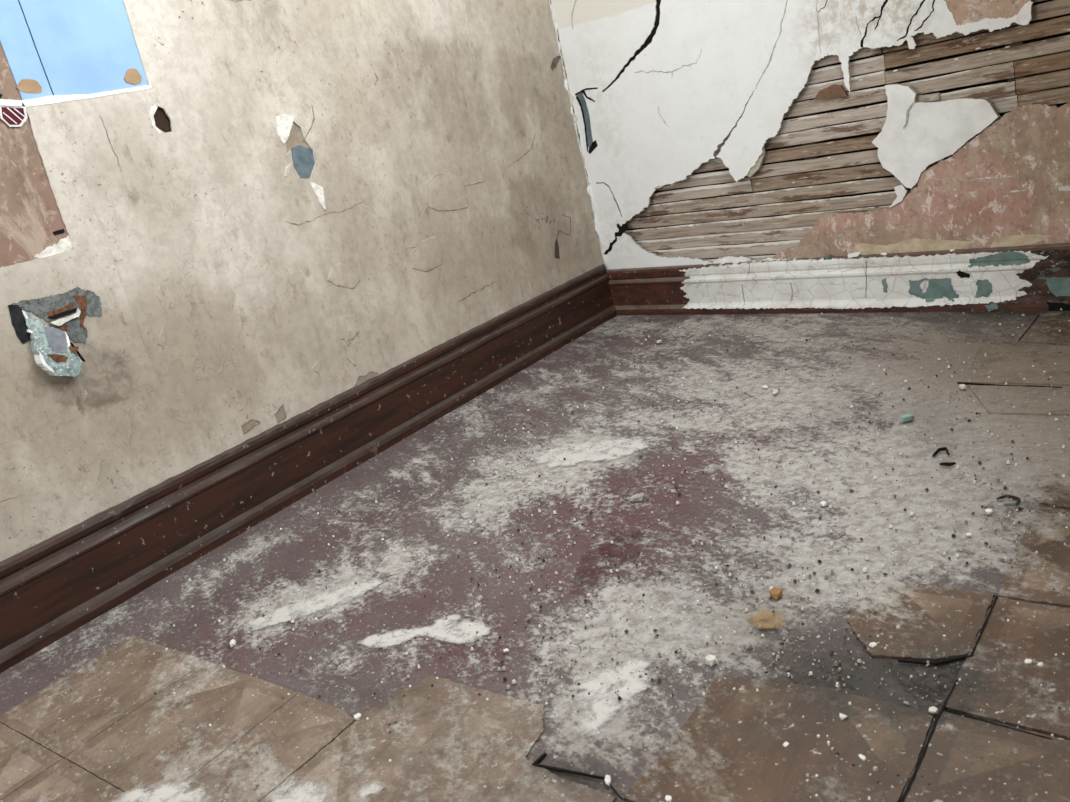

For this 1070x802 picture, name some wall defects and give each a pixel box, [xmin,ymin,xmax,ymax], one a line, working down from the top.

peeling [124,68,142,84]
crack [603,0,702,92]
crack [713,0,788,157]
crack [816,0,827,54]
crack [856,0,935,48]
peeling [0,42,73,268]
spalling [150,105,171,134]
peeling [276,105,326,211]
flaking render [625,0,1070,311]
crack [596,182,629,255]
spalling [8,305,33,344]
peeling [34,352,54,372]